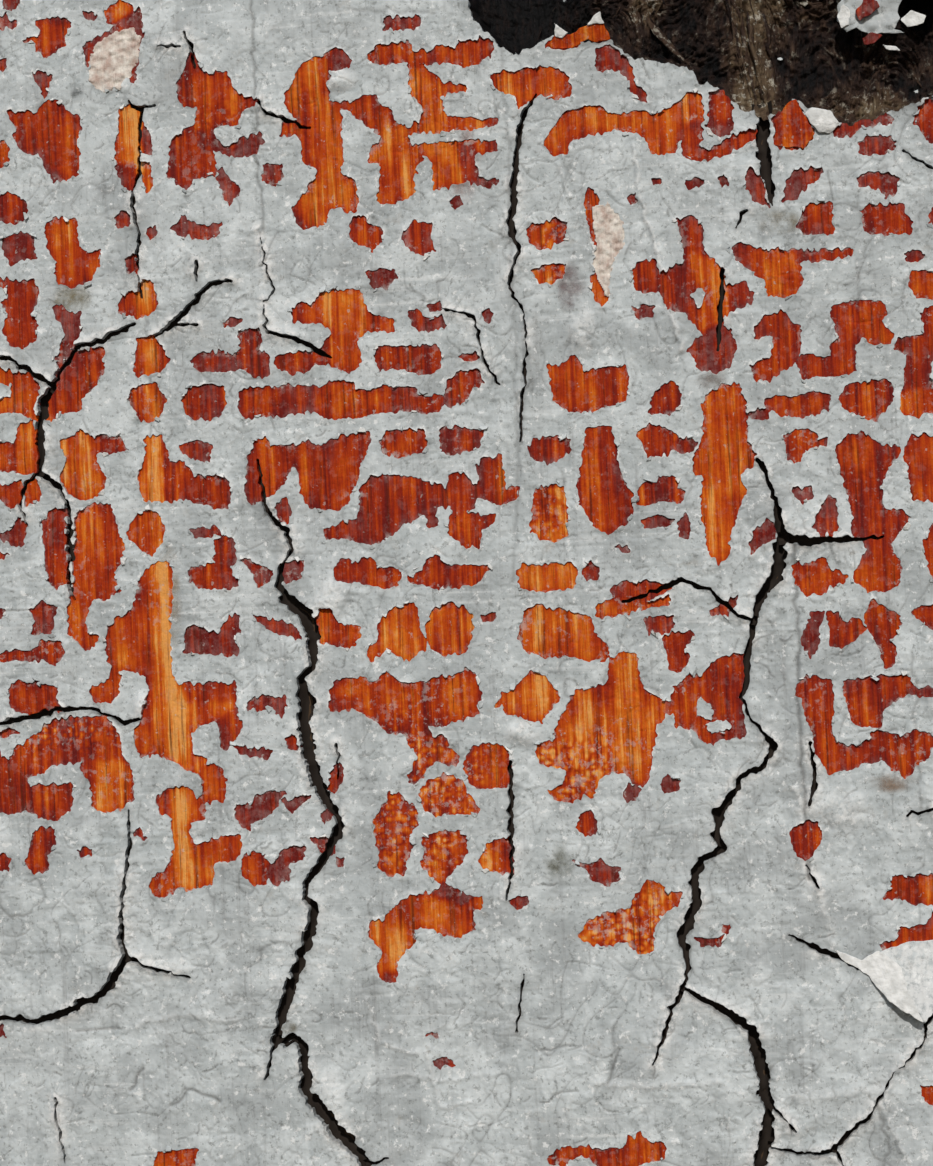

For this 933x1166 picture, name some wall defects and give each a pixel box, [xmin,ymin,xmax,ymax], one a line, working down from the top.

peeling [0,191,101,349]
crack [0,706,141,726]
crack [0,822,191,1024]
crack [0,102,233,599]
peeling [166,52,284,206]
crack [258,459,389,1166]
peeling [0,268,747,983]
peeling [279,14,499,253]
crack [442,95,537,442]
peeling [490,12,758,162]
peeling [526,163,933,779]
crack [622,458,933,1166]